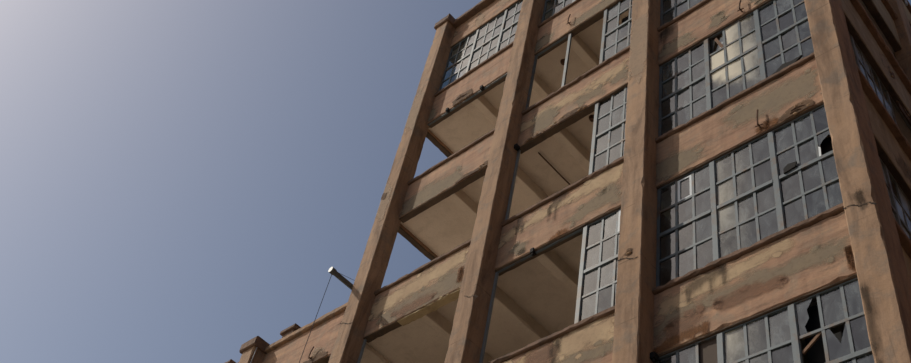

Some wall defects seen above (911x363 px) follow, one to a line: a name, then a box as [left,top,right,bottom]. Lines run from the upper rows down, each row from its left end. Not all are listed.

spalling [778,100,815,121]
peeling [498,163,623,249]
peeling [368,250,468,328]
peeling [505,315,615,363]